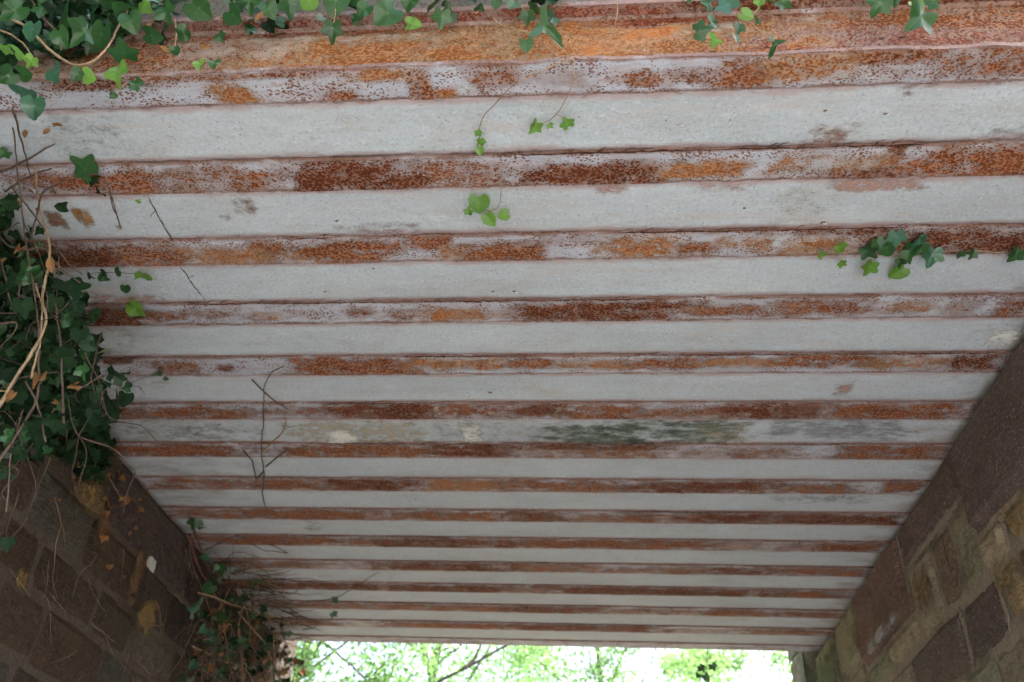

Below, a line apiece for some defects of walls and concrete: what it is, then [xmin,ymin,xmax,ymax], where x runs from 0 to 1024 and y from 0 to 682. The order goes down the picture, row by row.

corrosion [31,0,1024,106]
corrosion [3,128,1024,213]
corrosion [25,227,1024,268]
corrosion [347,298,975,323]
corrosion [99,403,976,420]
leakage [283,421,425,443]
leakage [447,420,488,443]
leakage [537,419,747,444]
leakage [765,419,902,441]
corrosion [142,478,929,494]
corrosion [166,508,904,525]
corrosion [193,535,887,553]